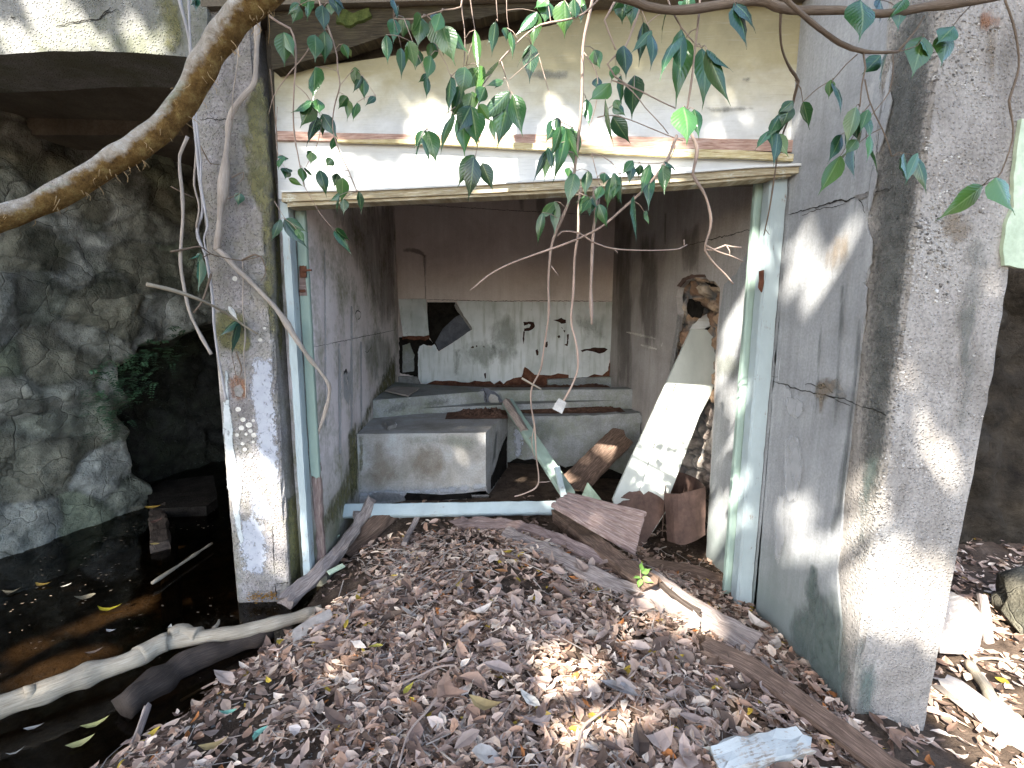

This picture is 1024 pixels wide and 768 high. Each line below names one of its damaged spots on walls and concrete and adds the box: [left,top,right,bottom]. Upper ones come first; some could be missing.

leakage [244,81,283,359]
crack [789,186,894,216]
spalling [677,274,718,287]
spalling [398,302,472,384]
spalling [669,299,705,374]
crack [774,379,886,416]